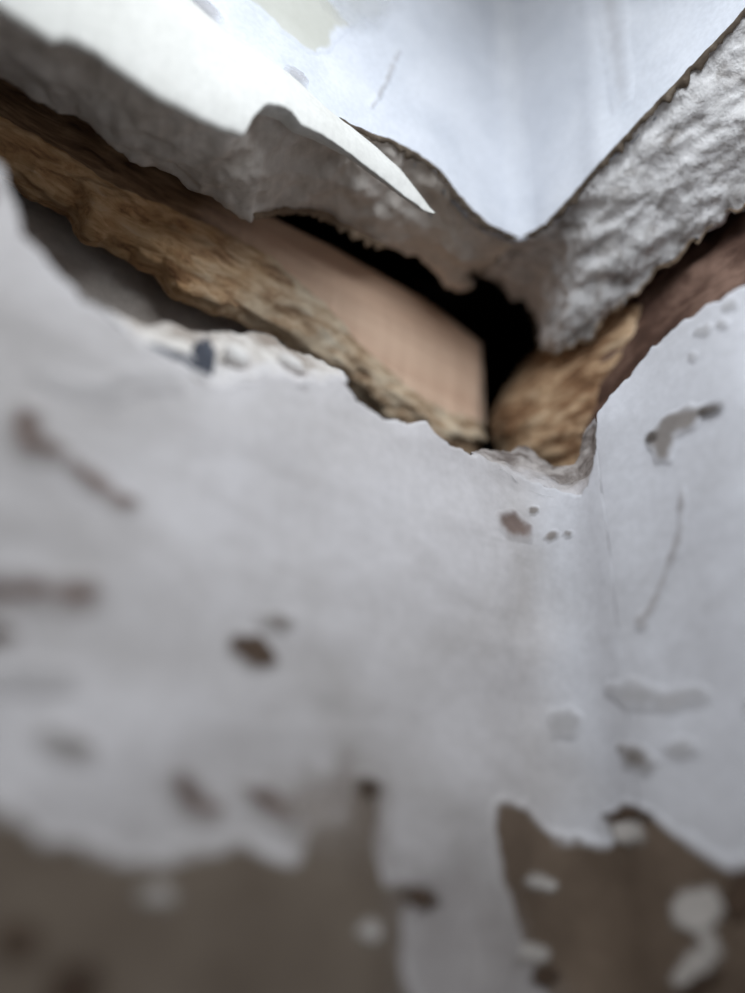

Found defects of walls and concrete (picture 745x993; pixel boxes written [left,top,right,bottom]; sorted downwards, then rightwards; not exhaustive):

spalling [0,0,745,356]
spalling [105,309,348,385]
spalling [470,419,597,495]
peeling [0,768,439,993]
peeling [488,792,745,993]